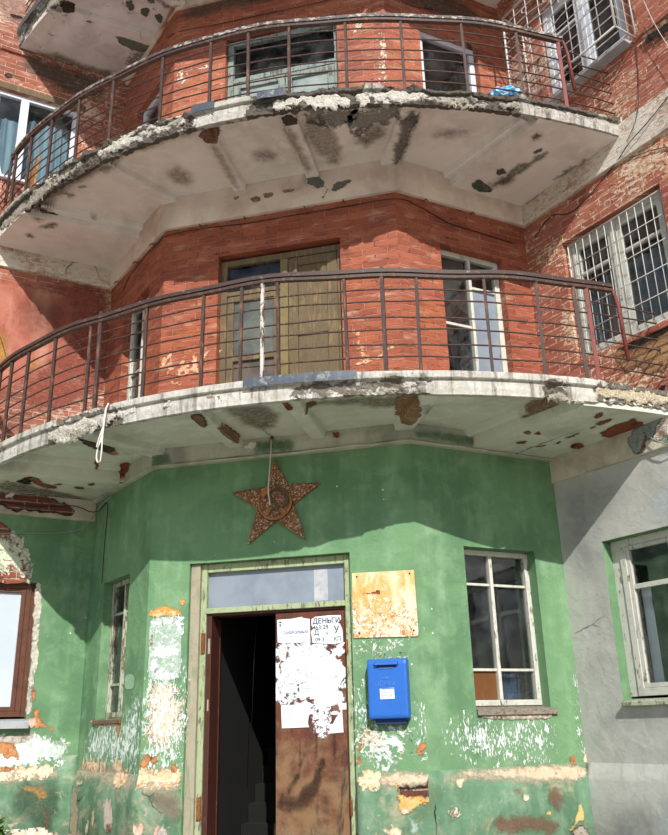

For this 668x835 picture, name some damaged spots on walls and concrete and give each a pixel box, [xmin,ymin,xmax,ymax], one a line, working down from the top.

leakage [408,0,475,17]
spalling [272,33,554,127]
spalling [97,116,189,157]
spalling [0,161,83,230]
rust [522,398,557,418]
rust [591,413,644,438]
spalling [595,385,668,406]
flaking render [0,521,42,715]
peeling [0,731,71,784]
peeling [70,659,190,835]
peeling [352,679,429,815]
peeling [442,670,590,835]